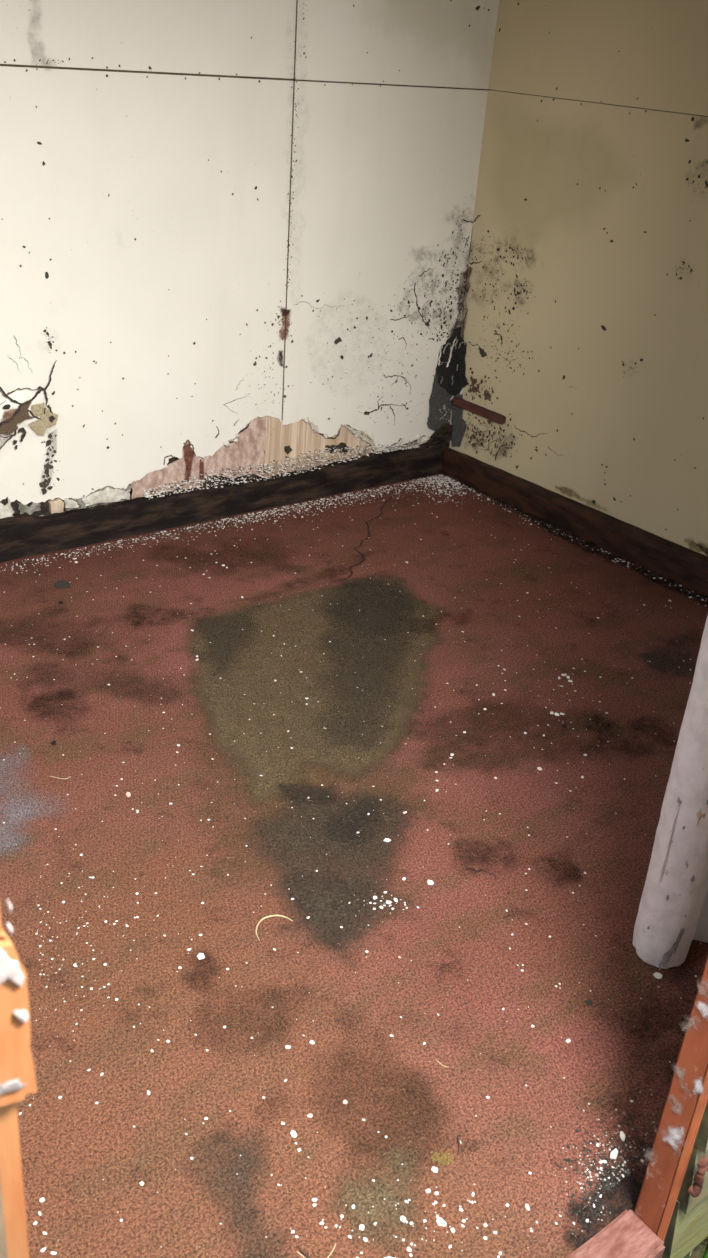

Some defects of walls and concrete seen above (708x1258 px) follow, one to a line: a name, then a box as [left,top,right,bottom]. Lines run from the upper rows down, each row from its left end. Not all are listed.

peeling [0,416,430,519]
water stain [327,211,551,469]
water stain [190,579,440,947]